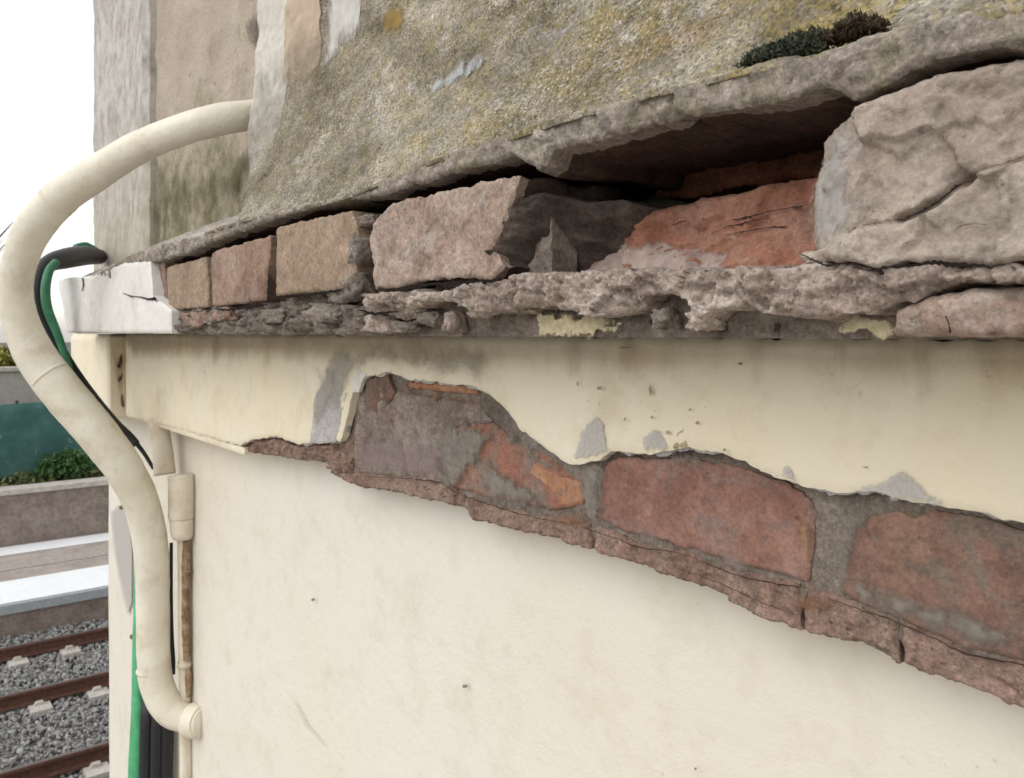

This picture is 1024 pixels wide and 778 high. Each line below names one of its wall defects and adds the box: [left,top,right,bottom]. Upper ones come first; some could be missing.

spalling [585,150,862,271]
crack [712,205,804,235]
crack [849,156,1024,233]
crack [123,293,156,301]
spalling [159,262,176,299]
spalling [181,306,240,329]
spalling [258,214,381,324]
spalling [362,294,559,334]
spalling [650,307,727,332]
crack [799,253,990,271]
spalling [247,370,1024,708]